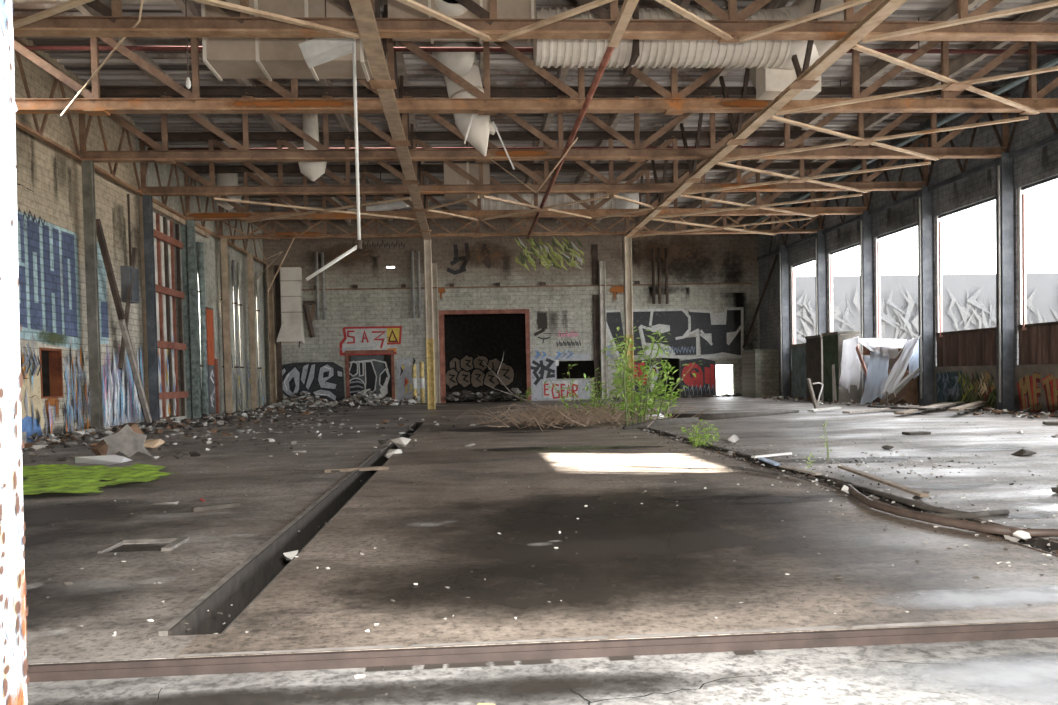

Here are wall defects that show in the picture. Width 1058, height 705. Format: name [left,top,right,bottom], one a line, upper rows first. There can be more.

damp [383,491,876,613]